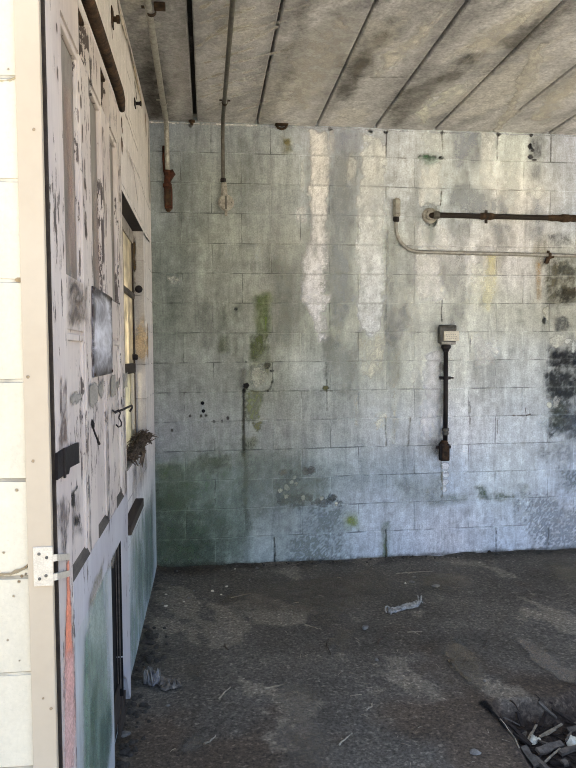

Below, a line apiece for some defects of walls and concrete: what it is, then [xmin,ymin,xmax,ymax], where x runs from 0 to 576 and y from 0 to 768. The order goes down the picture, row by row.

peeling [117,0,142,102]
peeling [69,251,87,325]
water stain [298,127,409,378]
water stain [546,260,576,303]
rust [547,214,576,222]
water stain [250,334,268,359]
peeling [59,372,128,446]
water stain [545,347,576,436]
peeling [58,486,80,551]